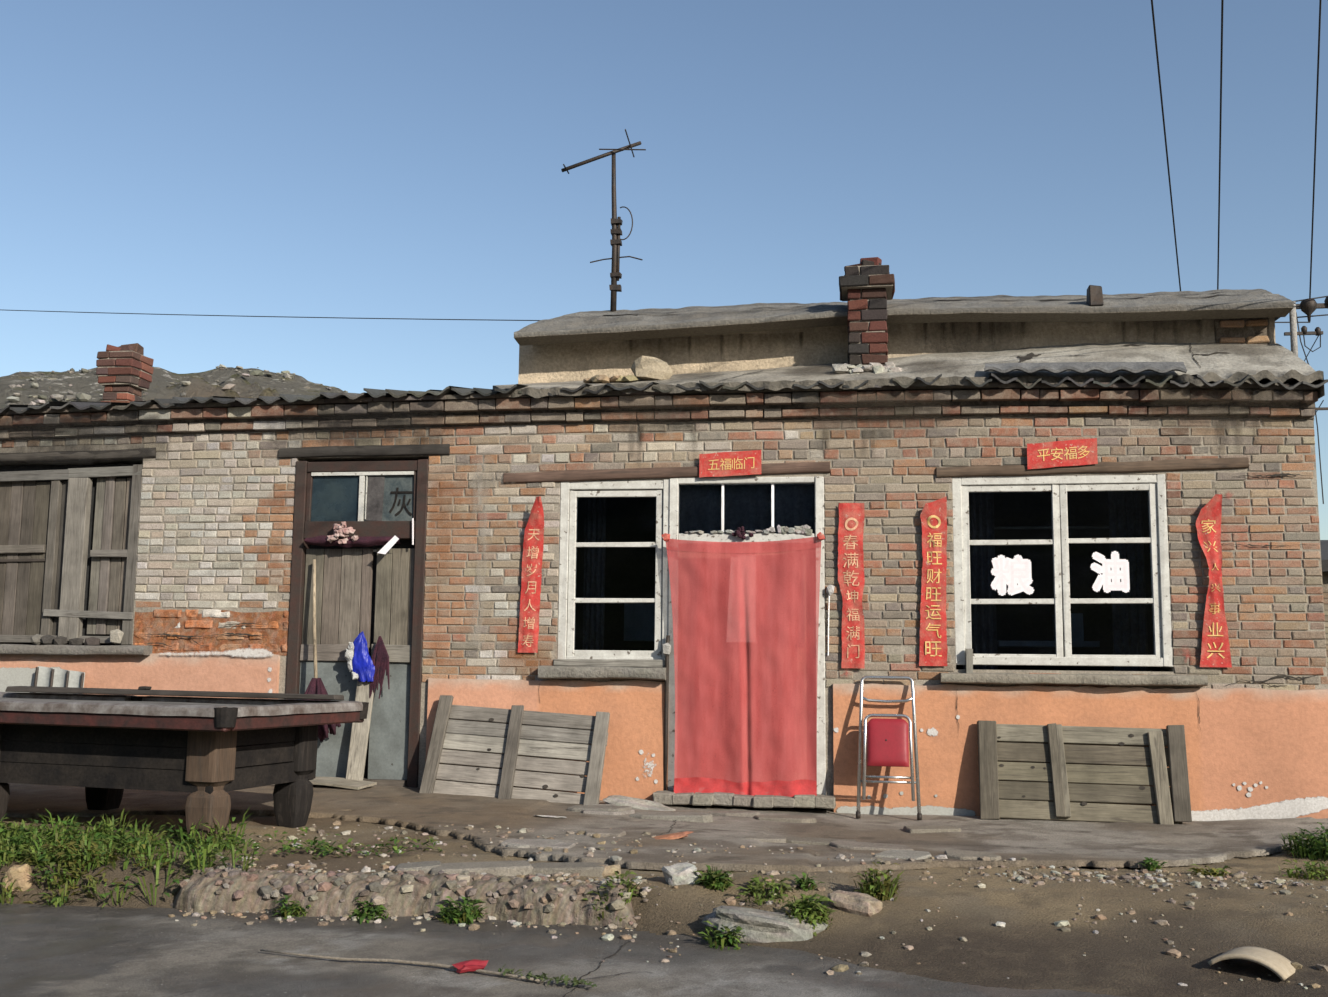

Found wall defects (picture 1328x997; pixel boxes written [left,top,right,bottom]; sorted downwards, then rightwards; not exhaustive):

flaking render [0,667,62,693]